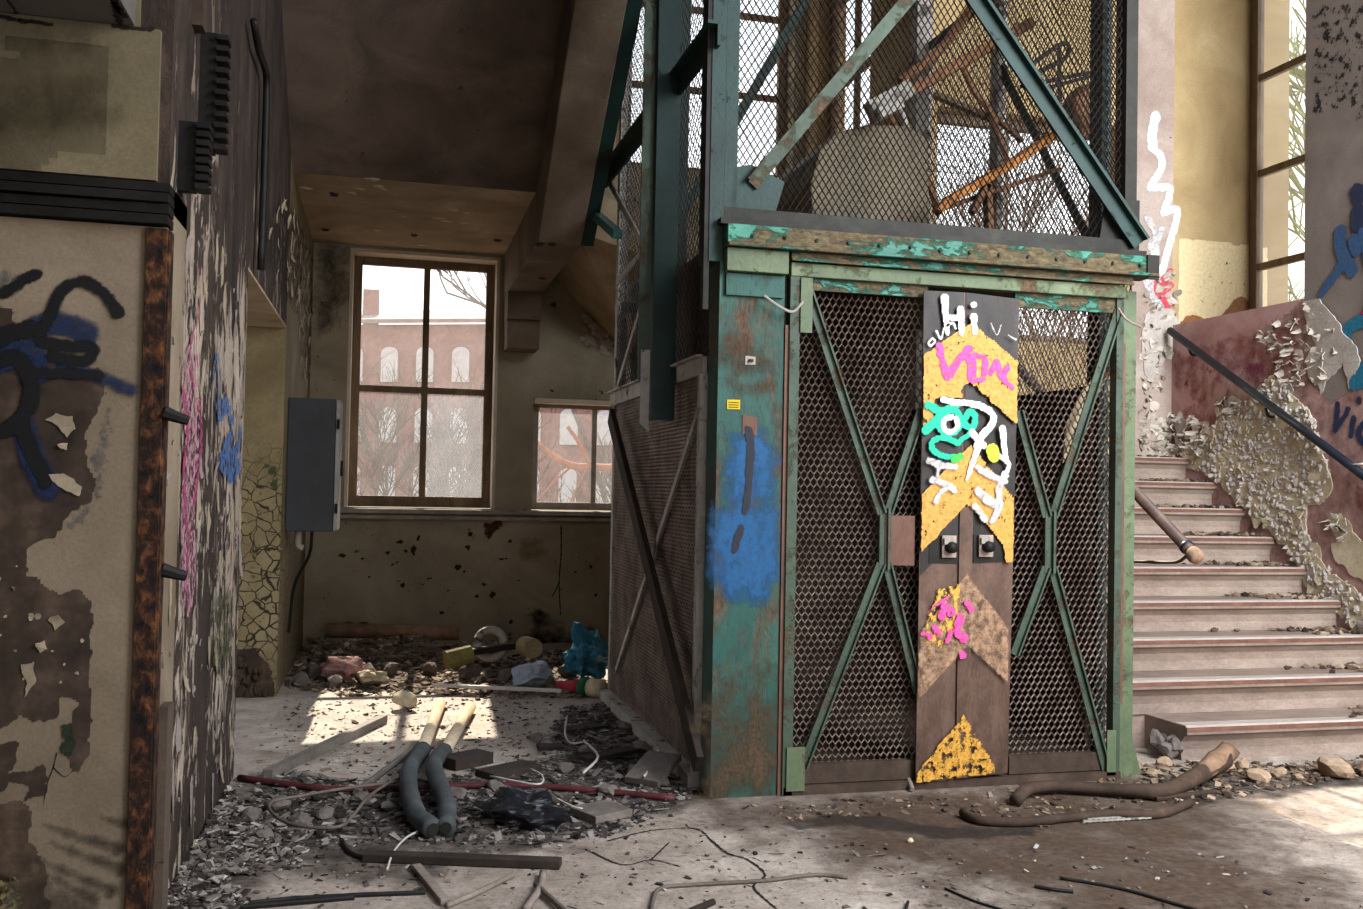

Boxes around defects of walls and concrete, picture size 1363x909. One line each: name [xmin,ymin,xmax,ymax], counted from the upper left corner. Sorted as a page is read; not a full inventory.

flaking render [0,305,14,328]
flaking render [1137,262,1363,631]
flaking render [0,361,104,909]